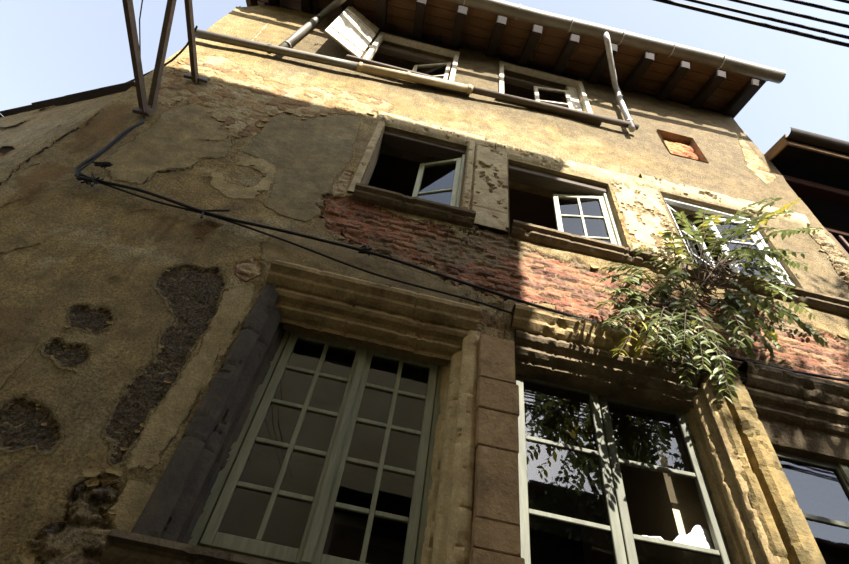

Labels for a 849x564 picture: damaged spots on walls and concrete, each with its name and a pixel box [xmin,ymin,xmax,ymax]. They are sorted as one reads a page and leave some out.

peeling [157,51,393,139]
crack [0,97,113,207]
flaking render [319,171,849,385]
spalling [38,302,116,371]
spalling [101,257,262,467]
spalling [0,390,65,456]
flaking render [108,479,157,532]